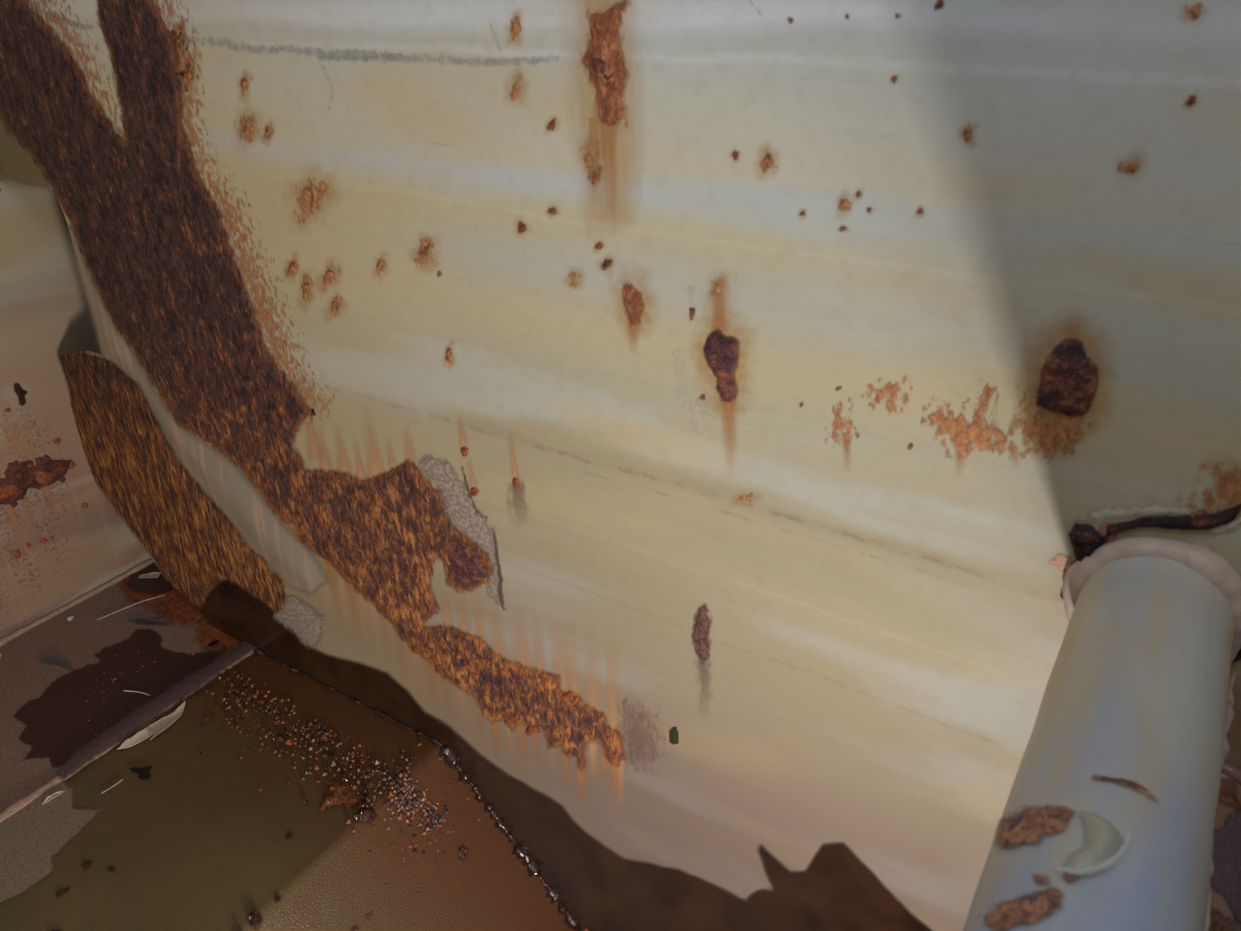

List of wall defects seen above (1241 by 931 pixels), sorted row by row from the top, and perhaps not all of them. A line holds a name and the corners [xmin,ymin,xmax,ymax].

rust [622,284,644,333]
rust [0,0,628,782]
rust [699,318,739,429]
rust [825,387,859,447]
rust [867,376,912,413]
rust [921,339,1098,459]
peeling [418,456,498,603]
rust [692,605,711,674]
peeling [118,701,186,749]
rust [318,777,377,824]